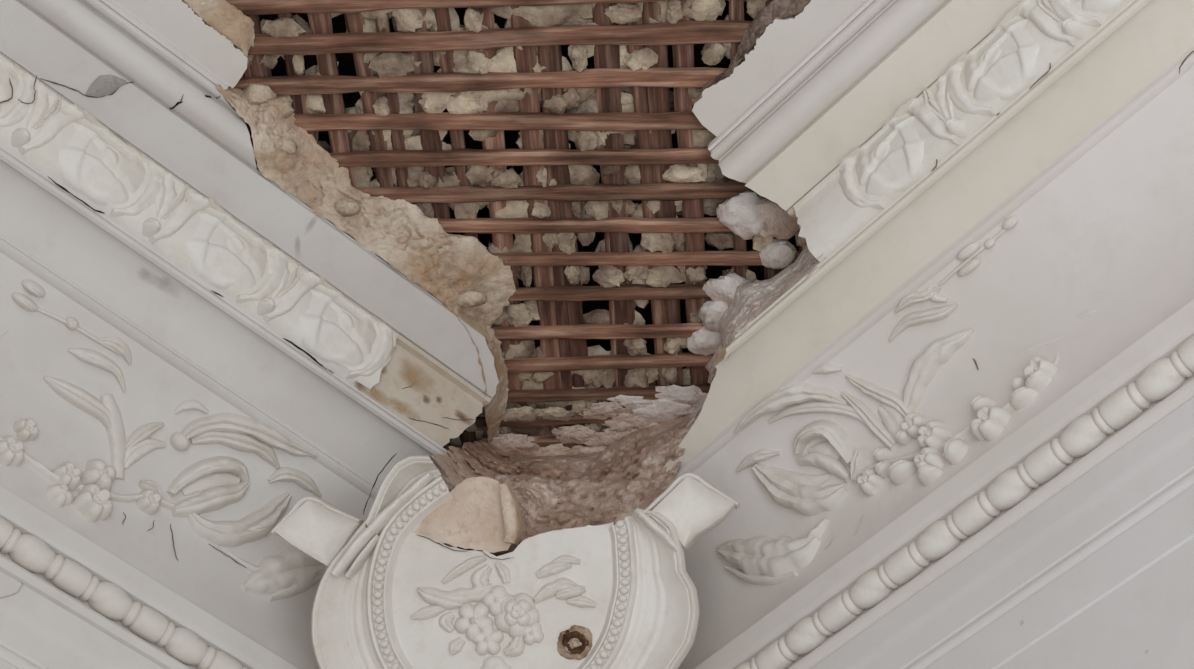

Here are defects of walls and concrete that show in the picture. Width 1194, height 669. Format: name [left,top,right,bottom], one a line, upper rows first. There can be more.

flaking render [183,0,255,61]
flaking render [701,0,811,91]
flaking render [216,83,820,556]
rust [557,625,593,660]